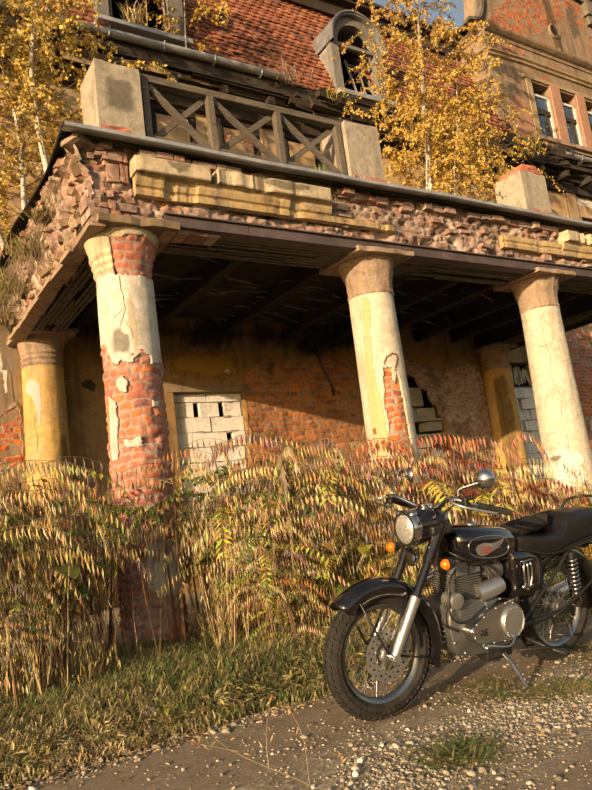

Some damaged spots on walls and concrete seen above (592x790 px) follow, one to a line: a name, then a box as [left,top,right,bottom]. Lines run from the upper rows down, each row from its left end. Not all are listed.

spalling [487,0,592,55]
spalling [0,131,156,347]
spalling [0,401,26,473]
peeling [26,379,42,426]
spalling [81,336,189,645]
spalling [240,296,502,496]
spalling [565,326,592,450]